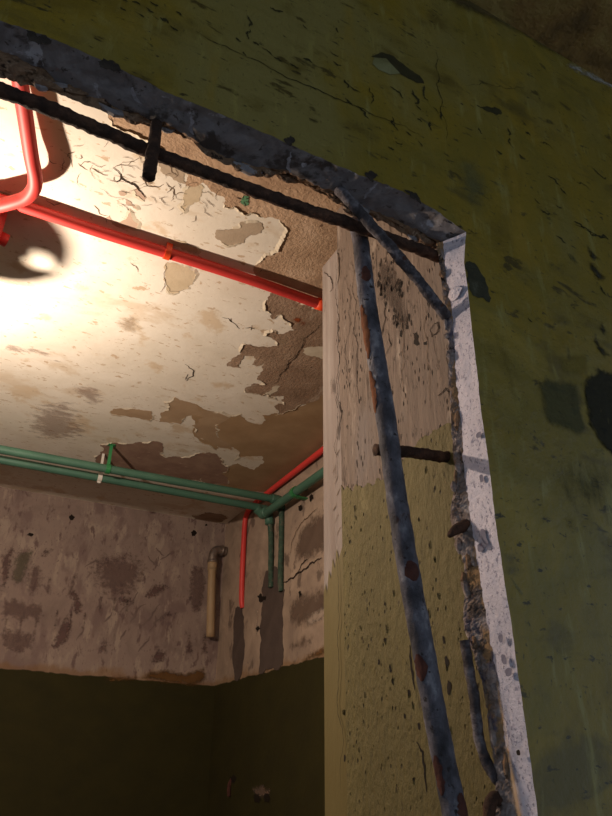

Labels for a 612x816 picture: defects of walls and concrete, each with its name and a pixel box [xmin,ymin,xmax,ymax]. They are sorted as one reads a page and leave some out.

spalling [0,50,152,142]
crack [49,144,223,222]
peeling [159,163,337,299]
peeling [160,121,356,217]
peeling [93,293,323,492]
damp [540,357,612,453]
spalling [360,204,521,816]
damp [2,549,38,591]
damp [4,599,42,620]
damp [53,576,86,648]
crack [283,509,344,788]
rust [405,560,419,581]